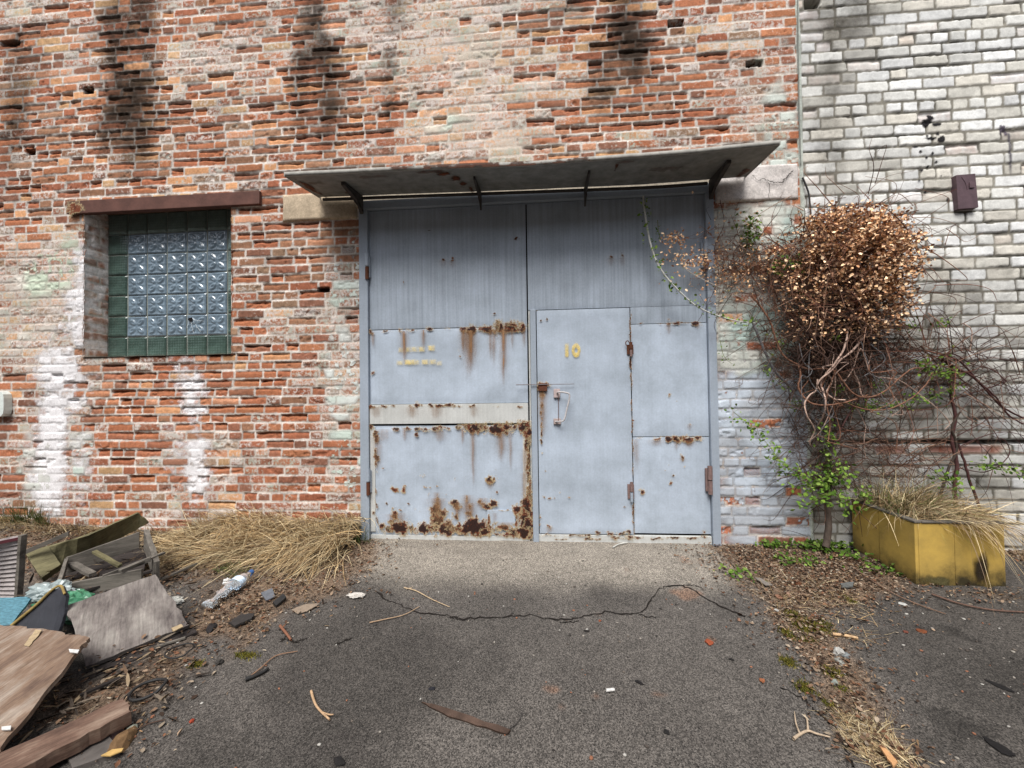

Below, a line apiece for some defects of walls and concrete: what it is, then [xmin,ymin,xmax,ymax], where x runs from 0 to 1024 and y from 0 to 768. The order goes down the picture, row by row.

rust [369,327,432,353]
rust [449,313,526,372]
efflorescence [27,243,92,517]
efflorescence [168,358,212,502]
rust [369,424,384,469]
rust [372,382,706,541]
crack [376,584,746,623]